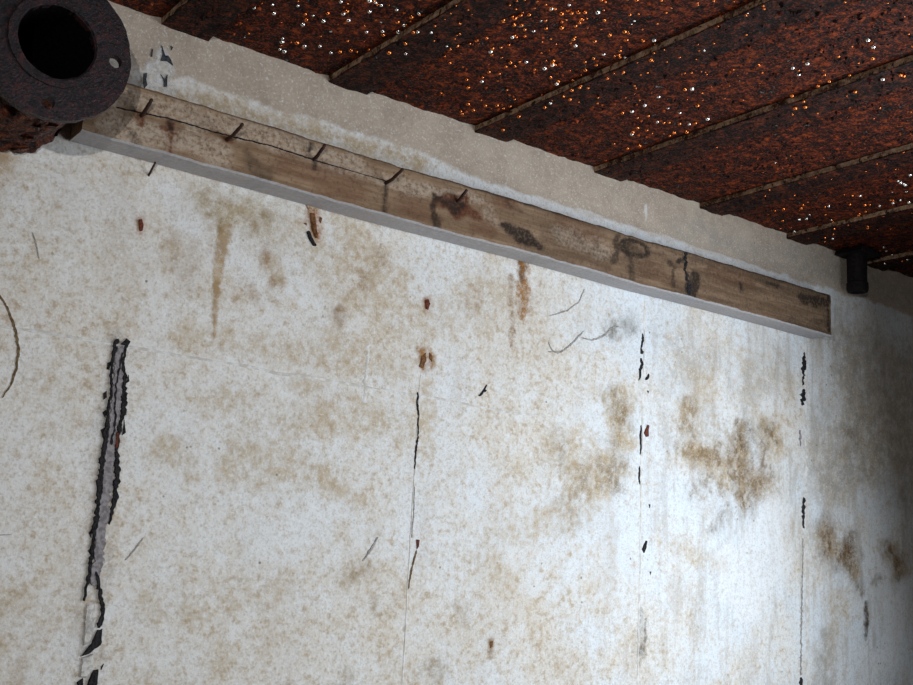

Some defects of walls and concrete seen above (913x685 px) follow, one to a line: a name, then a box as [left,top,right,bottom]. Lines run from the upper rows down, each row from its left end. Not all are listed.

corrosion [510,261,531,318]
crack [638,333,649,393]
crack [798,352,806,406]
crack [638,425,649,484]
crack [76,338,131,685]
crack [798,497,806,685]